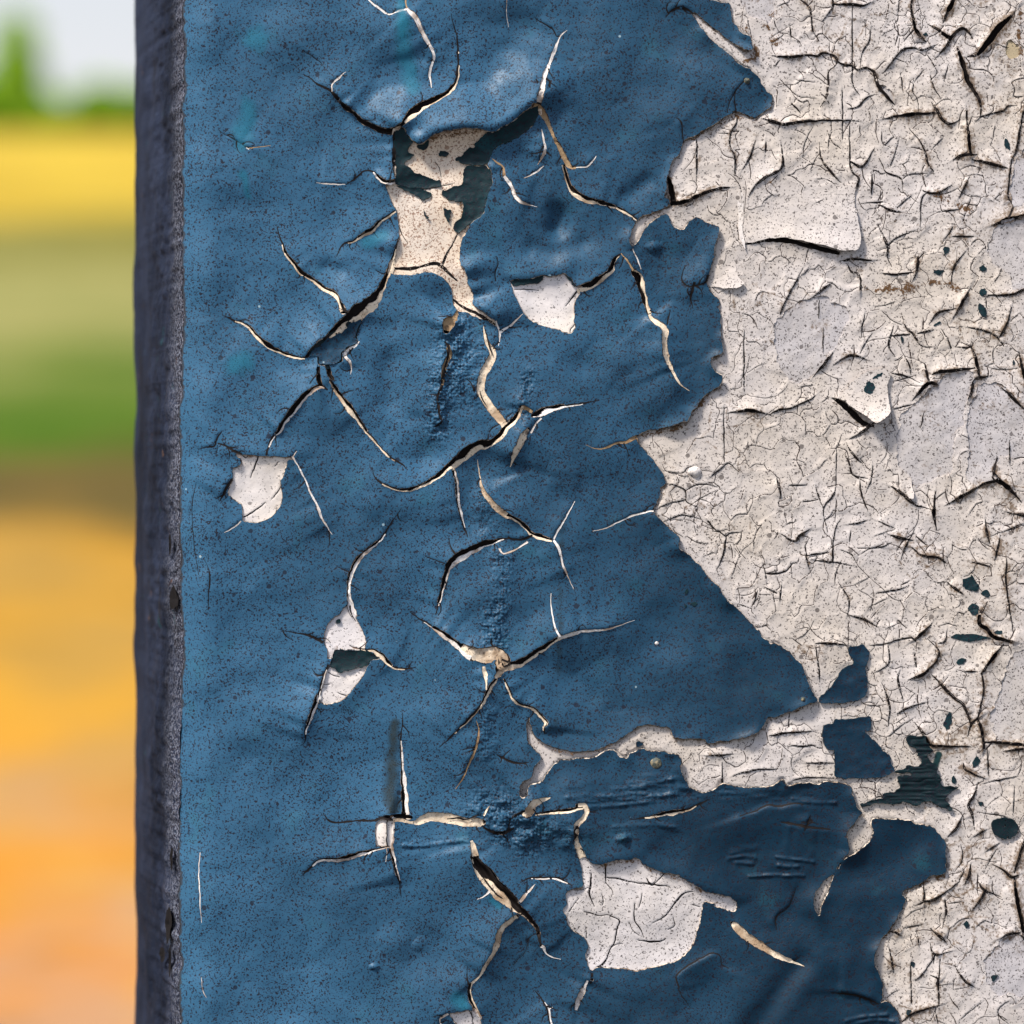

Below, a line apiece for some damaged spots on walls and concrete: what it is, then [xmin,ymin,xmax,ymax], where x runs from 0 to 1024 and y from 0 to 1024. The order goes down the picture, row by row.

crack [219,130,271,154]
crack [304,0,460,185]
peeling [385,104,542,327]
crack [493,17,641,223]
peeling [229,454,292,522]
peeling [510,0,1024,1024]
crack [577,0,1024,1024]
peeling [317,596,380,704]
crack [192,210,634,1024]
peeling [375,815,394,848]